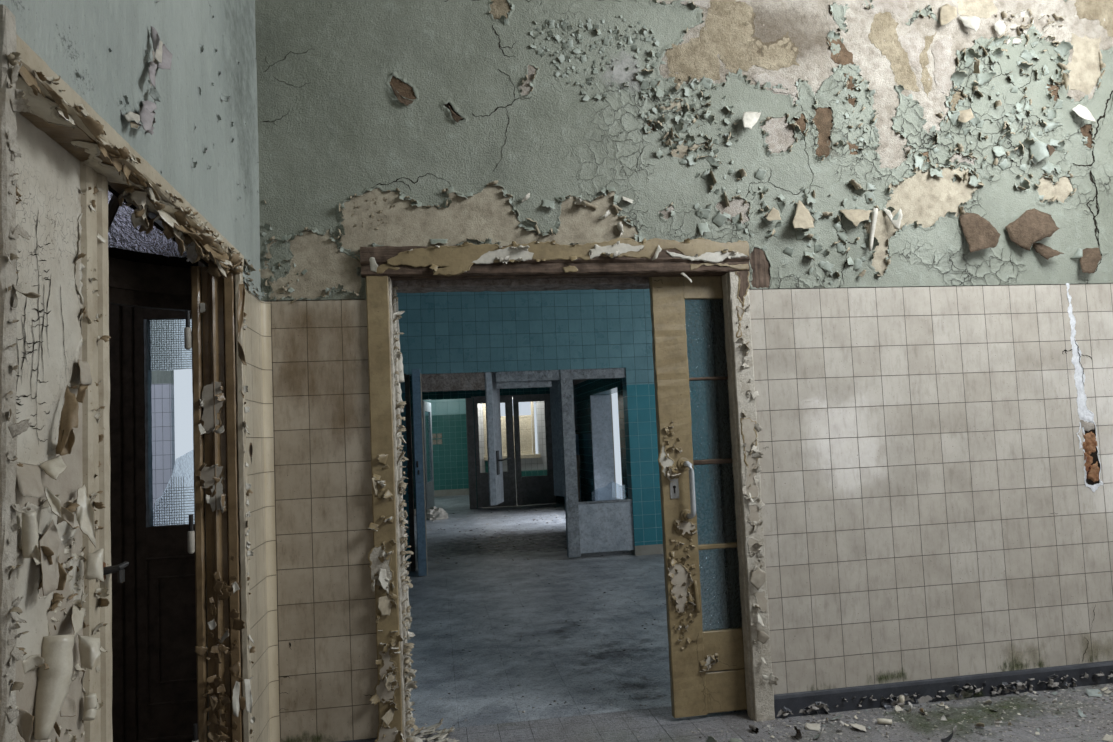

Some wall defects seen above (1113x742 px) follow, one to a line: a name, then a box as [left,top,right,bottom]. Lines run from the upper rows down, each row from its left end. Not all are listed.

peeling [119,31,159,135]
peeling [118,183,243,277]
crack [255,30,315,125]
crack [364,173,451,192]
peeling [259,180,647,304]
crack [472,25,529,173]
peeling [633,0,1113,278]
crack [1073,90,1113,272]
peeling [4,185,111,742]
peeling [196,463,228,513]
spalling [1077,417,1103,492]
peeling [367,373,459,742]